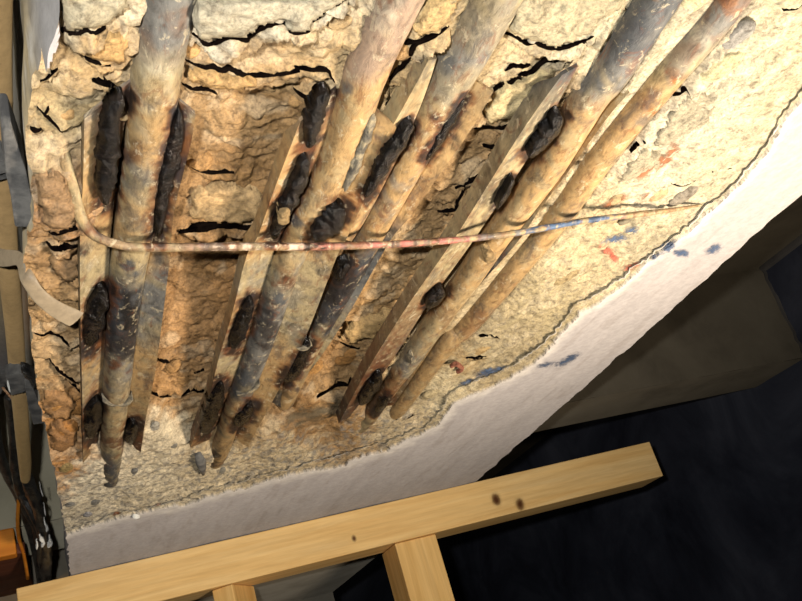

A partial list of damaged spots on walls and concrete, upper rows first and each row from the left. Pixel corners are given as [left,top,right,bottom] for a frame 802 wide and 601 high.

crack [60,25,106,36]
crack [82,55,117,88]
crack [182,0,346,99]
crack [383,25,449,106]
crack [493,32,594,92]
spalling [23,0,147,310]
spalling [171,0,376,243]
spalling [377,0,632,241]
spalling [434,0,716,345]
crack [178,221,251,234]
spalling [42,390,77,420]
spalling [164,360,181,374]